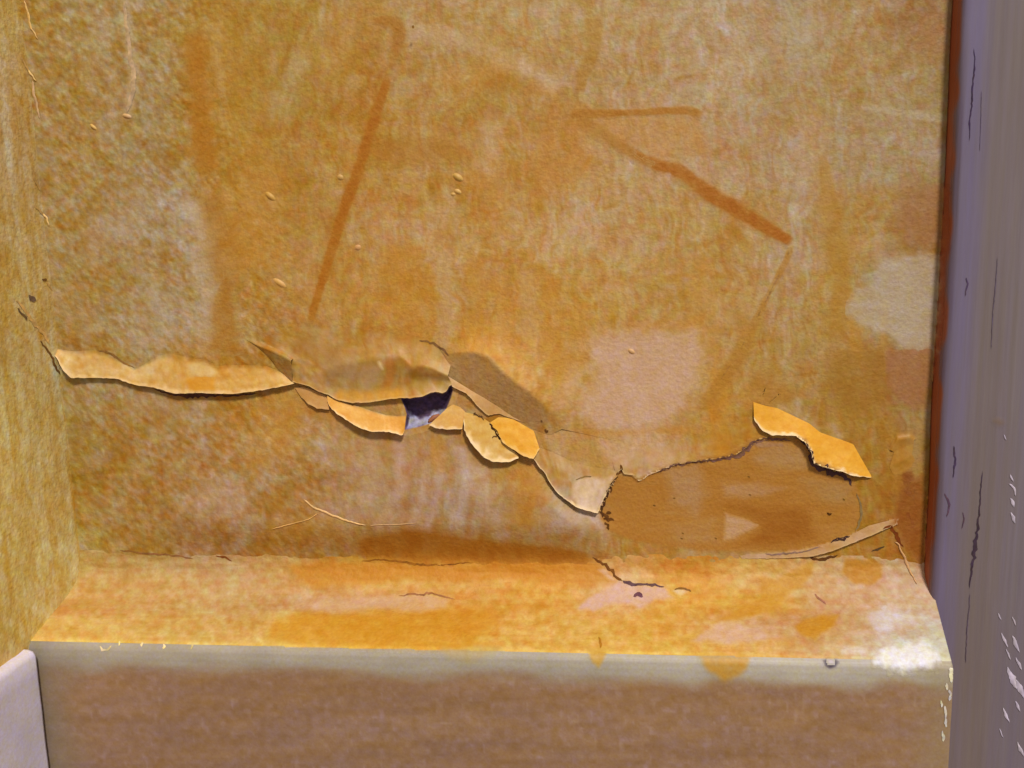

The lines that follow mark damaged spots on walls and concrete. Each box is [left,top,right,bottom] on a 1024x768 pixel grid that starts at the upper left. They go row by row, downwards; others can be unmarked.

peeling [55,327,452,435]
spalling [430,402,897,559]
water stain [286,521,617,591]
crack [592,557,691,598]
water stain [708,558,816,625]
water stain [840,556,885,587]
water stain [261,601,505,669]
water stain [793,612,840,642]
water stain [837,603,948,677]